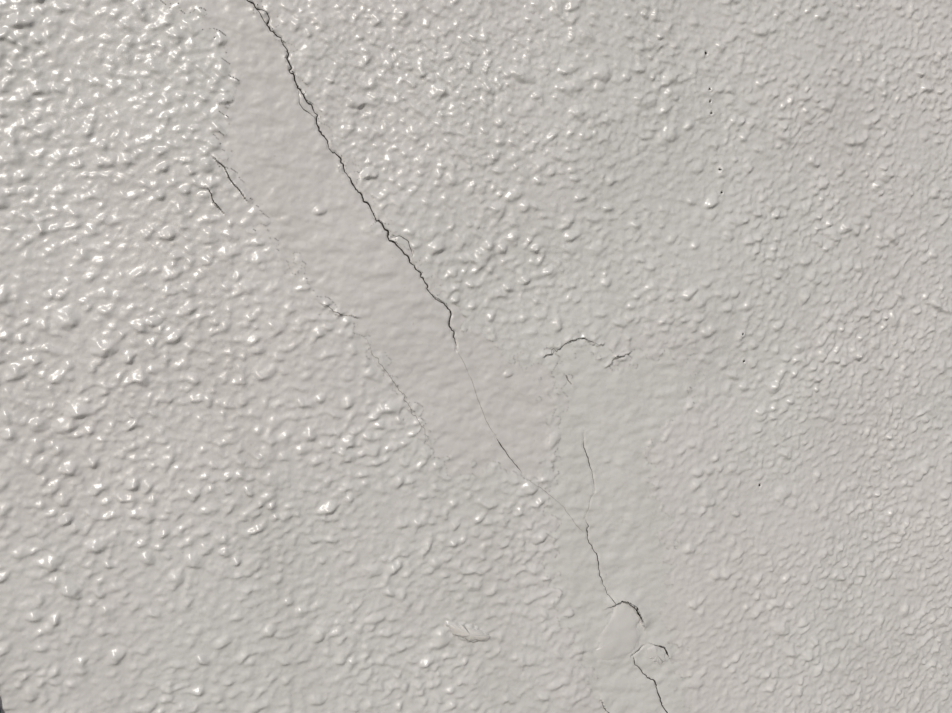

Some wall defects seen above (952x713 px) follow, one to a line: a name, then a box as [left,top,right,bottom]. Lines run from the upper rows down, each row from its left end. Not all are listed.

crack [247,0,616,604]
crack [634,647,668,713]